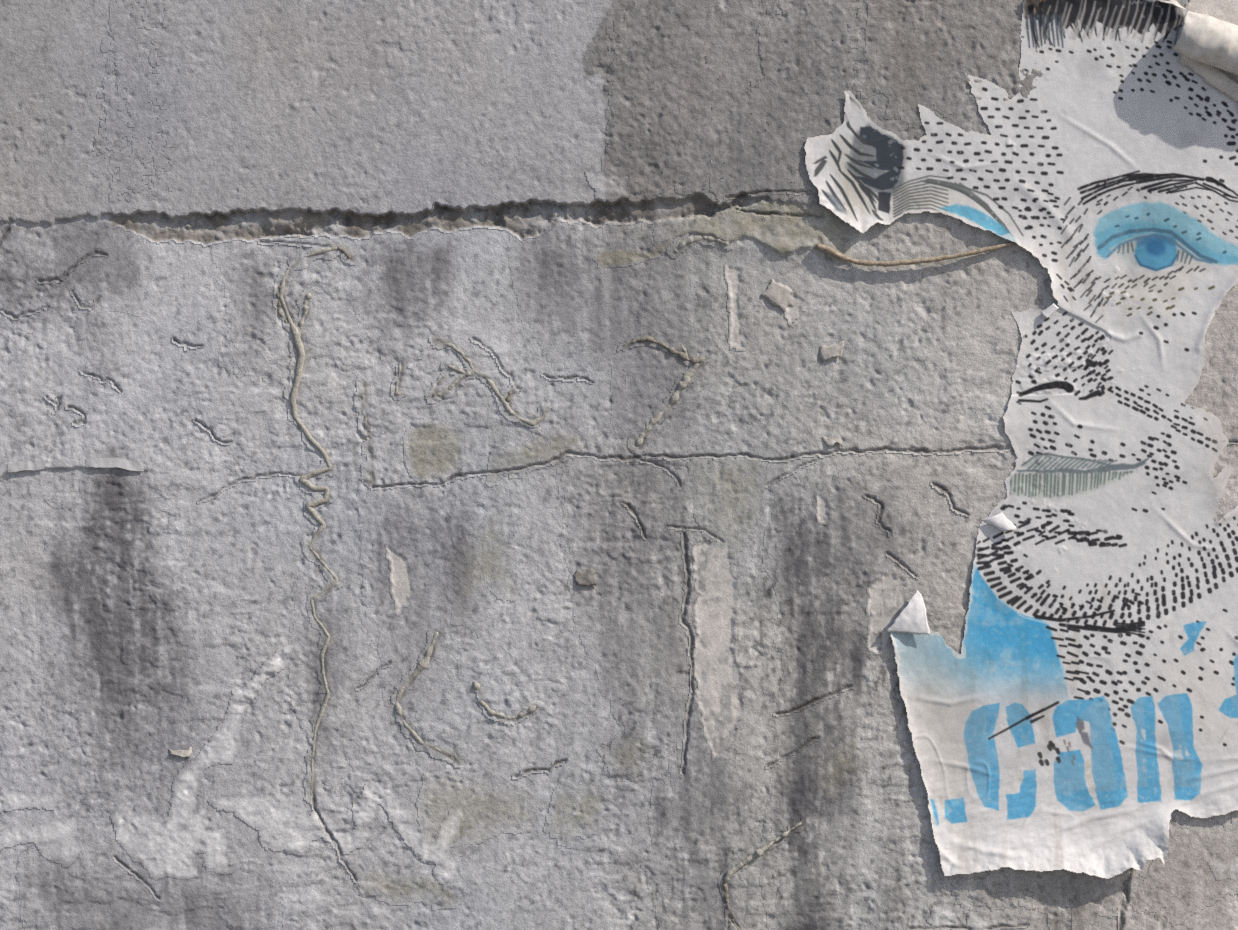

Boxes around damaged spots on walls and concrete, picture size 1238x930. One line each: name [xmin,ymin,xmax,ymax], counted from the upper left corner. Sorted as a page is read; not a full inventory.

peeling [1184,0,1238,26]
crack [0,226,11,246]
crack [674,189,824,256]
crack [1226,439,1238,447]
water stain [507,221,929,930]
water stain [29,441,215,815]